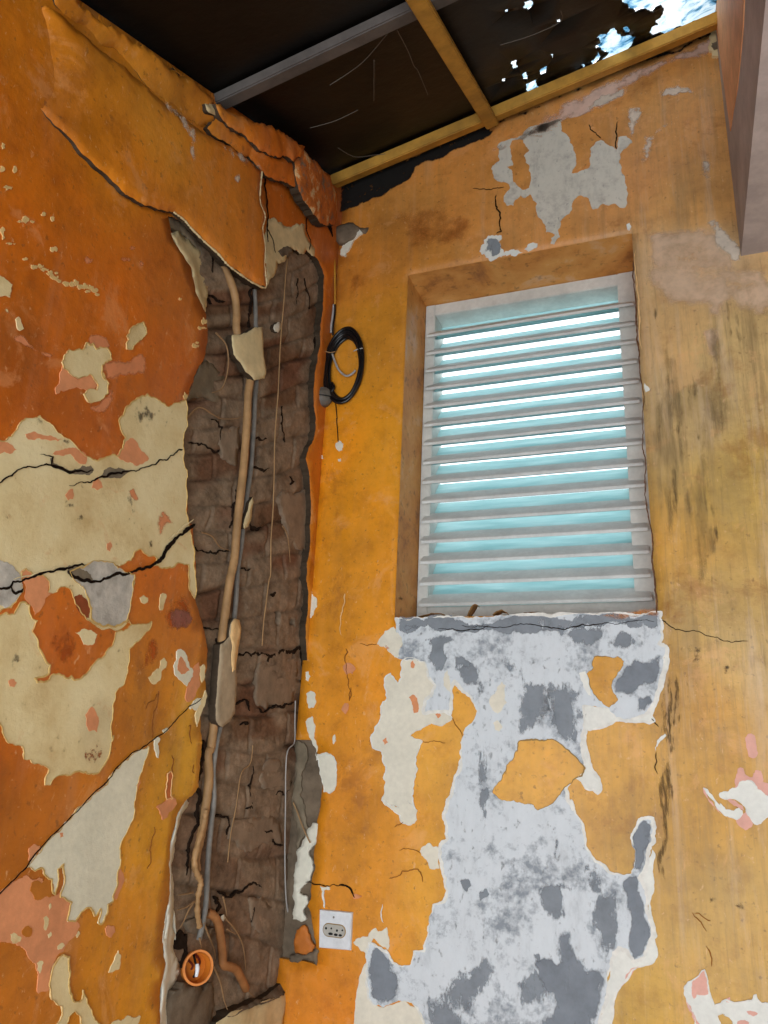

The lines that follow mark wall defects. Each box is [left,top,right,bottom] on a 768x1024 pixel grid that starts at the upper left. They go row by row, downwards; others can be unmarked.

peeling [491,31,718,244]
crack [473,187,503,233]
crack [0,449,183,486]
crack [439,251,741,643]
crack [0,519,195,595]
spalling [0,217,337,1024]
leakage [664,678,680,752]
crack [0,691,201,894]
peeling [353,604,670,1024]
leakage [658,768,673,873]
peeling [703,733,768,830]
peeling [684,969,768,1024]